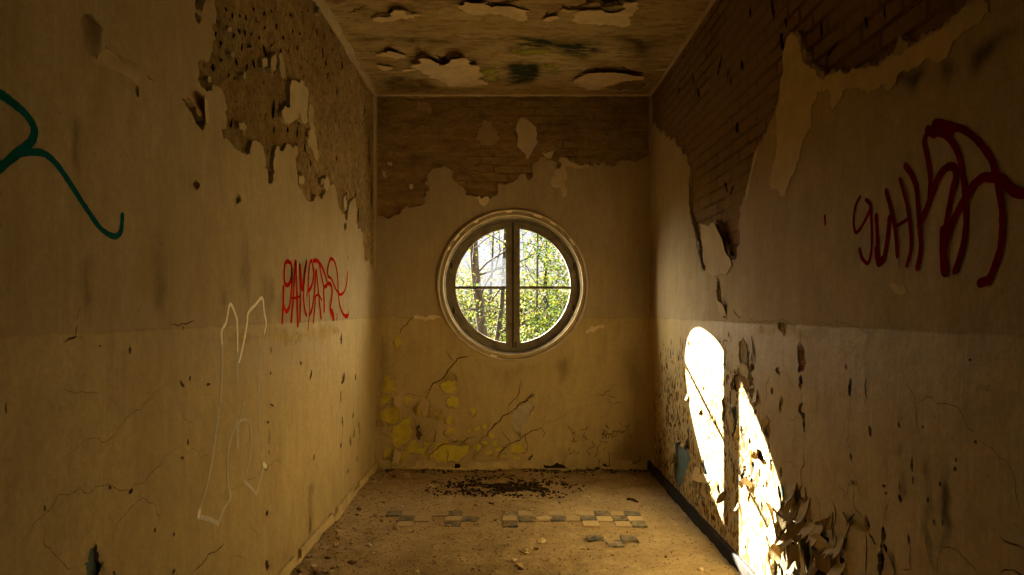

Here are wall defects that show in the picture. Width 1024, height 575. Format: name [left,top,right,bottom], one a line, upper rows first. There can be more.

flaking render [198,0,990,277]
crack [7,381,212,570]
crack [424,351,470,398]
peeling [424,371,528,464]
crack [478,379,581,460]
peeling [655,332,864,575]